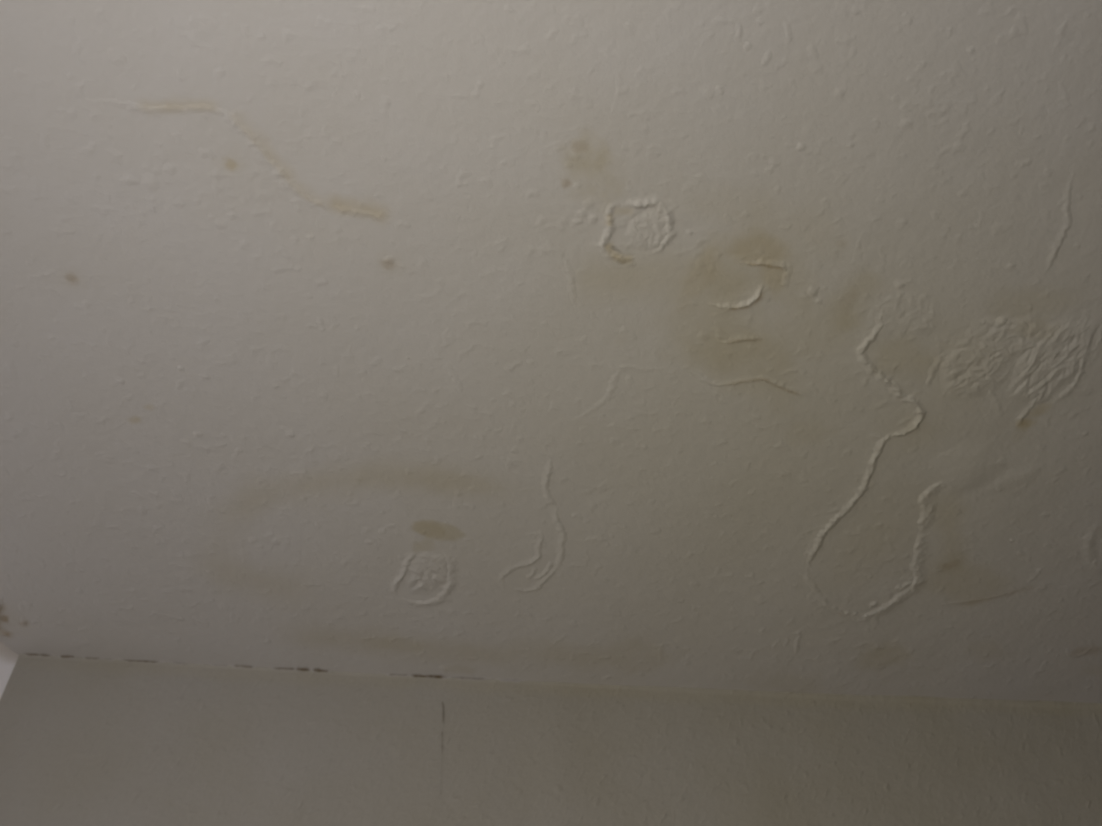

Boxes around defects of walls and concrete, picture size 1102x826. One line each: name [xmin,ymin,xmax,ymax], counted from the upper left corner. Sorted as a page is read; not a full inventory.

peeling [707,282,764,309]
crack [20,652,331,672]